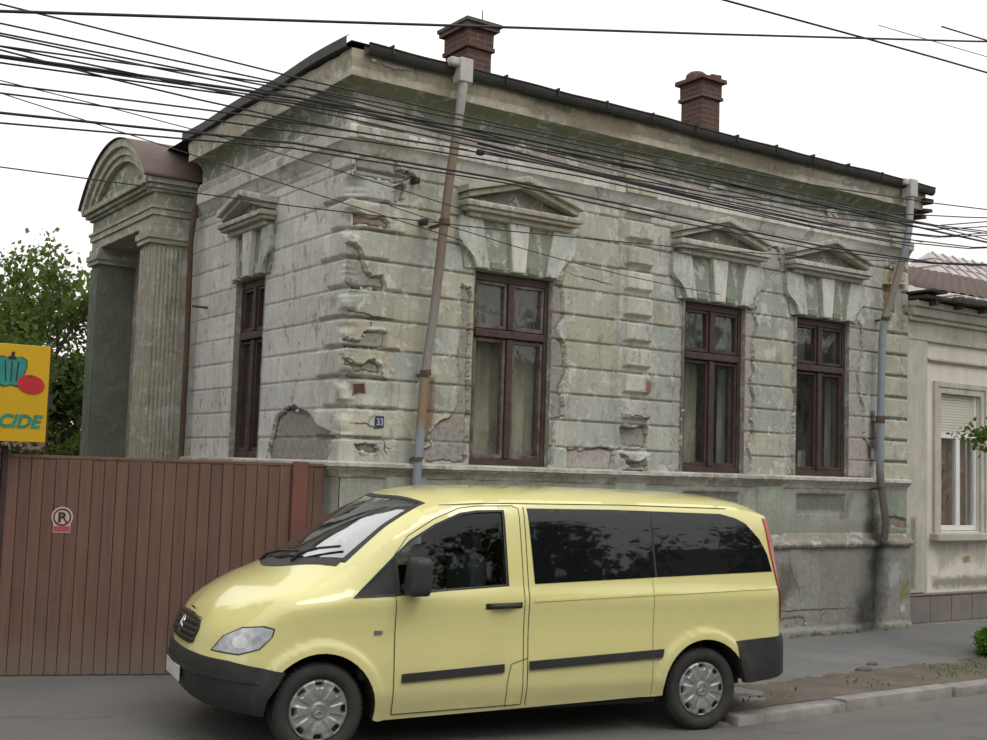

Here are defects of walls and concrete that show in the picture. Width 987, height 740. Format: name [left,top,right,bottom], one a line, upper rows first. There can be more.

spalling [345,243,382,290]
spalling [341,331,395,396]
spalling [422,287,470,463]
spalling [265,409,336,460]
spalling [619,425,644,448]
spalling [626,460,643,470]
leakage [858,499,903,623]